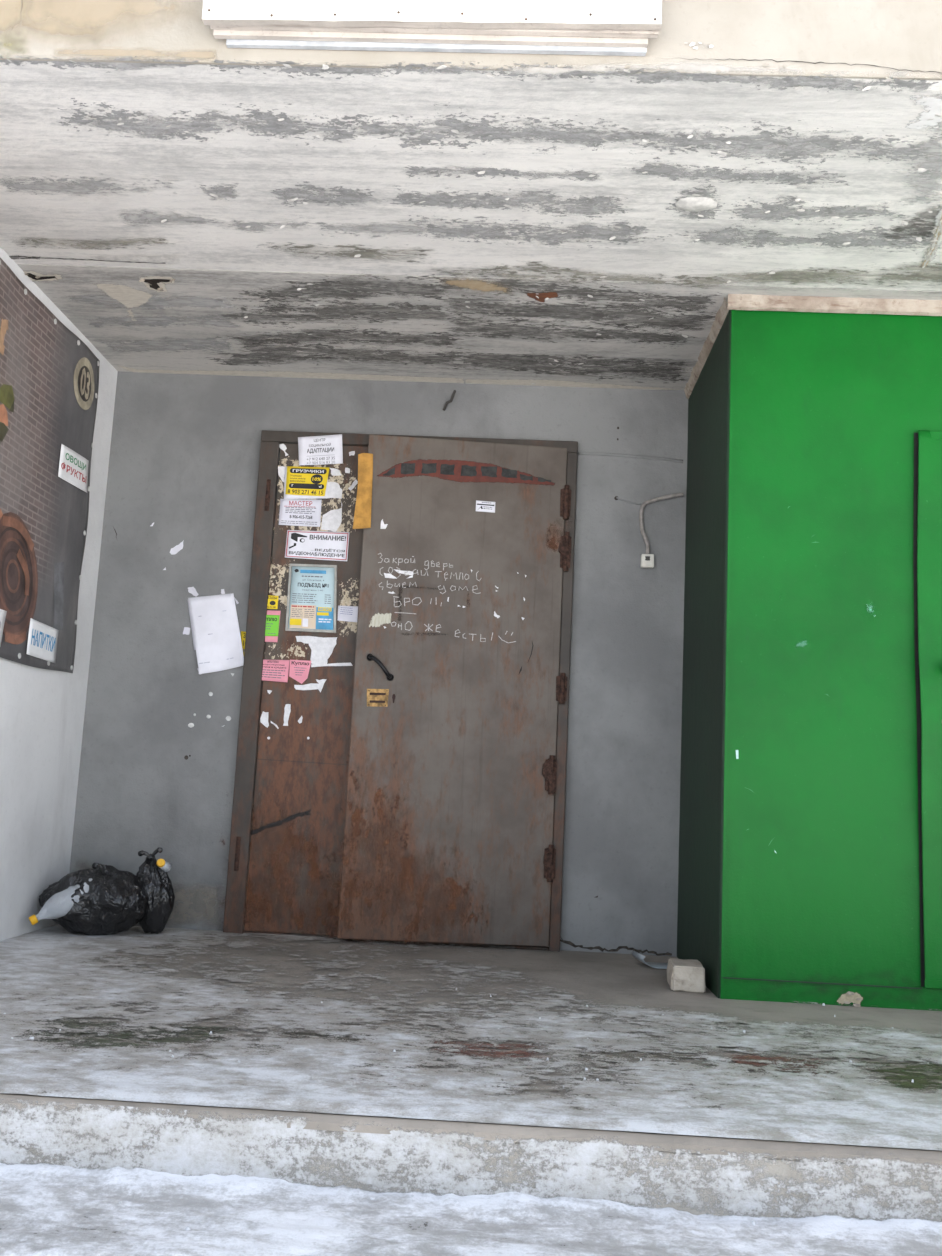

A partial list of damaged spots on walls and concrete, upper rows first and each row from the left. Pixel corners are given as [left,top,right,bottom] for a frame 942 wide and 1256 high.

crack [662,58,941,73]
peeling [0,56,942,262]
crack [922,209,942,268]
spalling [23,271,63,282]
peeling [95,276,175,321]
peeling [118,365,679,390]